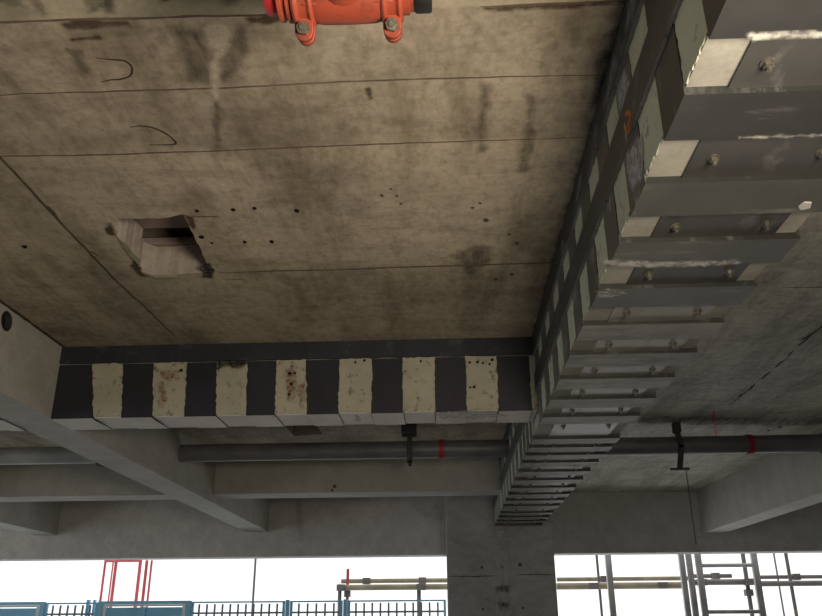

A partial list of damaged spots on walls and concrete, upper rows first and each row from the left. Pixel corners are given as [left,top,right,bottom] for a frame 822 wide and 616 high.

crack [0,14,268,24]
leakage [248,16,280,24]
leakage [178,23,247,107]
crack [0,75,595,96]
spalling [105,226,178,280]
spalling [200,263,215,279]
crack [0,137,583,336]
crack [0,299,65,347]